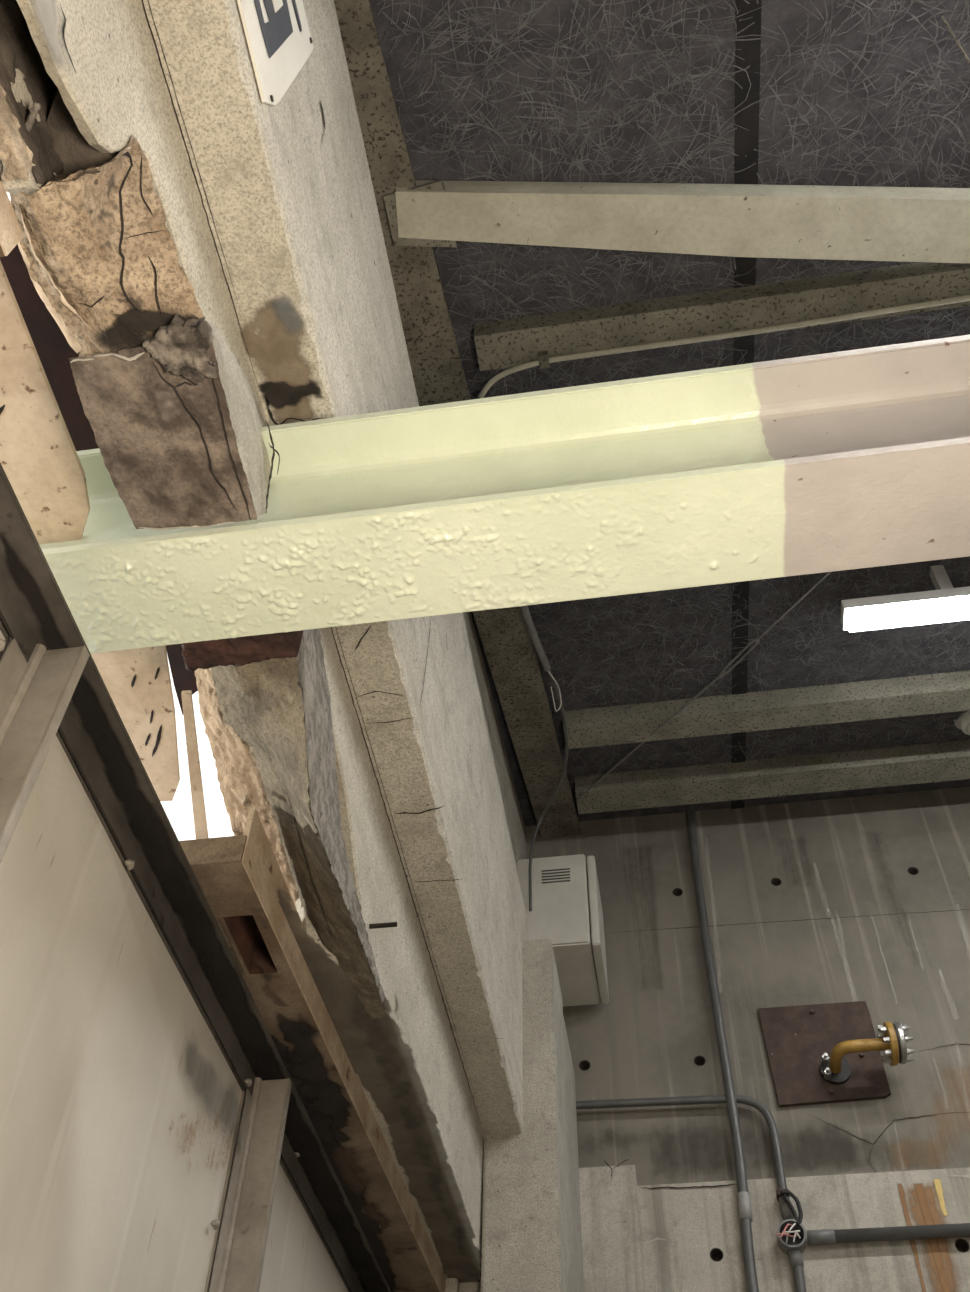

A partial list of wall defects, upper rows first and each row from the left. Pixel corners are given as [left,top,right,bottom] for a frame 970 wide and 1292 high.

spalling [0,0,219,386]
crack [80,152,162,312]
crack [153,362,280,520]
flaking render [240,299,322,425]
spalling [195,628,388,1020]
water stain [260,965,396,1292]
crack [808,1112,970,1173]
corrosion [898,1179,957,1292]